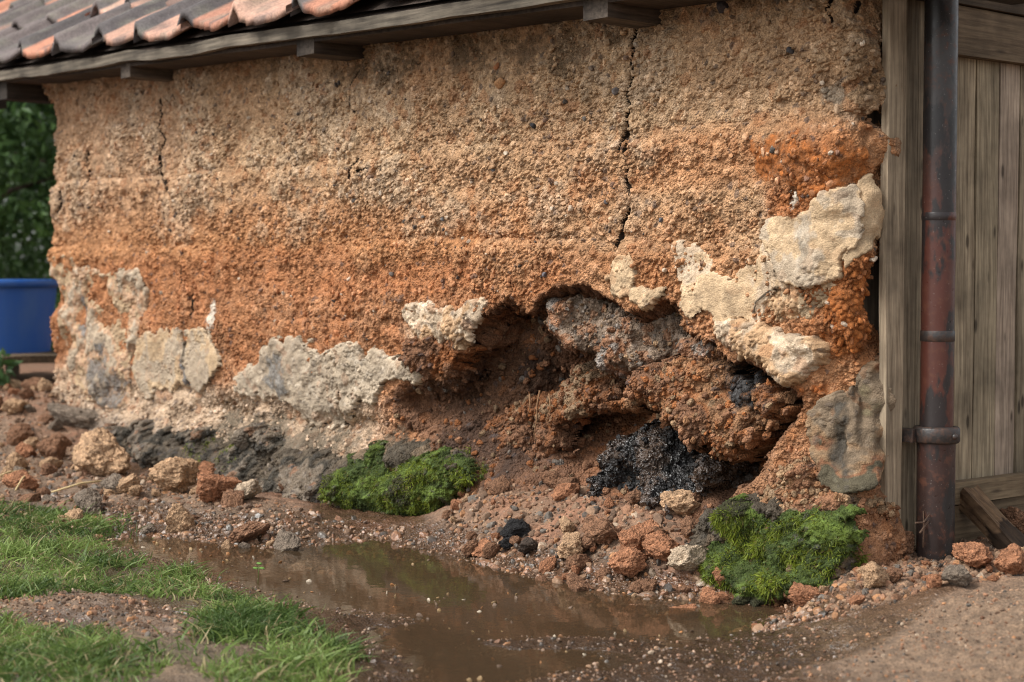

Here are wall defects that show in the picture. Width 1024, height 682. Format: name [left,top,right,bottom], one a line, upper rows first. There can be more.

crack [158,98,173,203]
crack [615,29,638,252]
peeling [47,251,223,410]
spalling [233,173,897,502]
spalling [690,450,773,521]